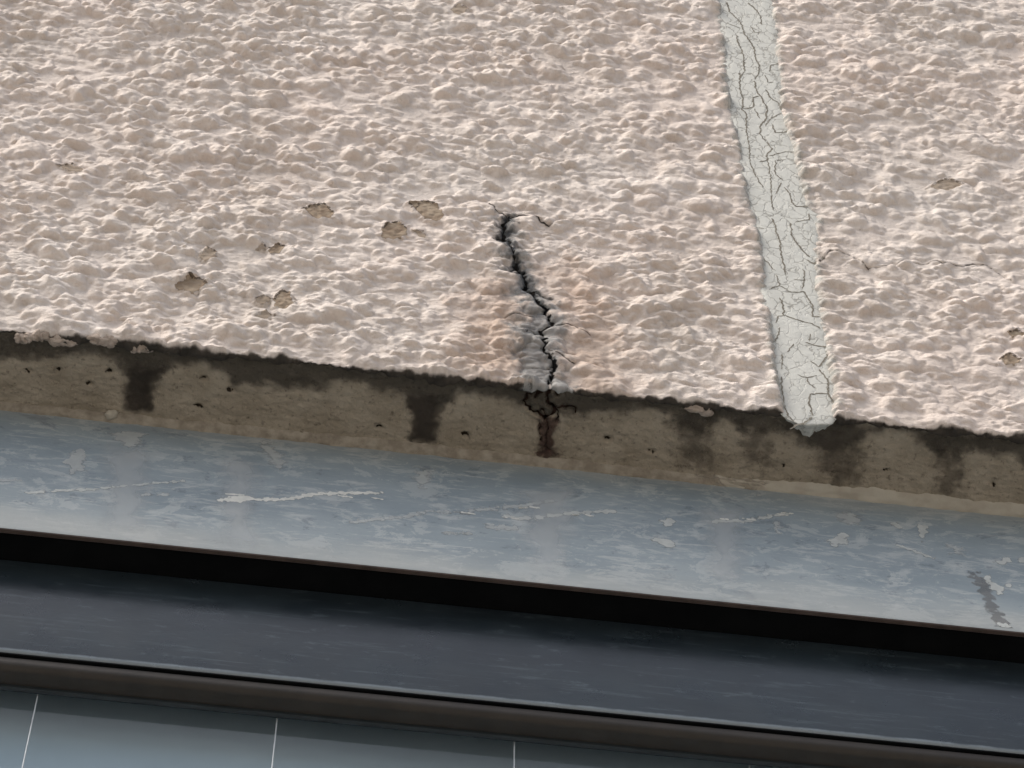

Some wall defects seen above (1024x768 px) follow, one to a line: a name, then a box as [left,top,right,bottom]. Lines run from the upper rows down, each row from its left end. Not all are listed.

peeling [931,178,964,190]
peeling [302,203,334,218]
peeling [381,200,444,239]
crack [726,2,898,429]
peeling [257,242,285,253]
peeling [175,271,208,294]
peeling [256,290,293,318]
crack [489,203,589,448]
spalling [14,329,118,348]
spalling [130,345,153,354]
damp [0,214,1024,462]
peeling [999,352,1022,366]